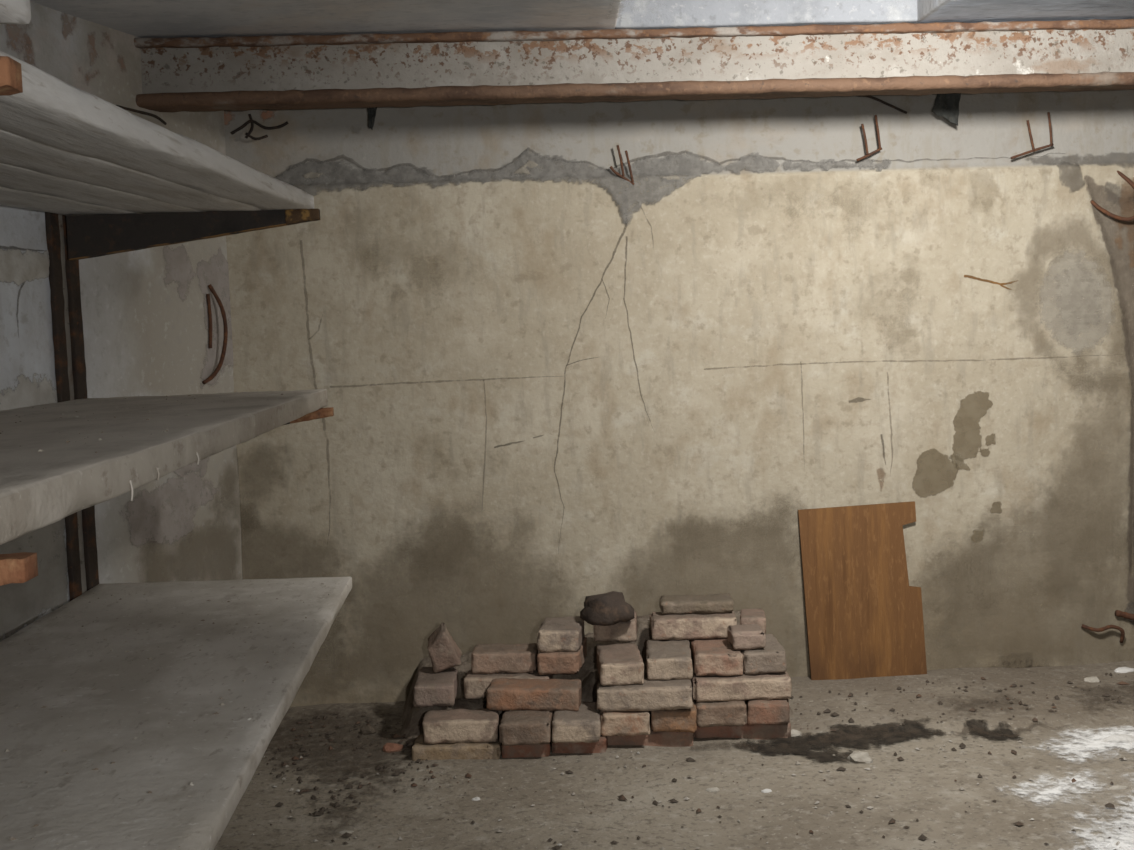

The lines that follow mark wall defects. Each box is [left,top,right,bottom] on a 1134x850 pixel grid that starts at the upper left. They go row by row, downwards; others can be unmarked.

spalling [276,115,890,224]
spalling [1081,171,1134,643]
peeling [0,518,68,639]